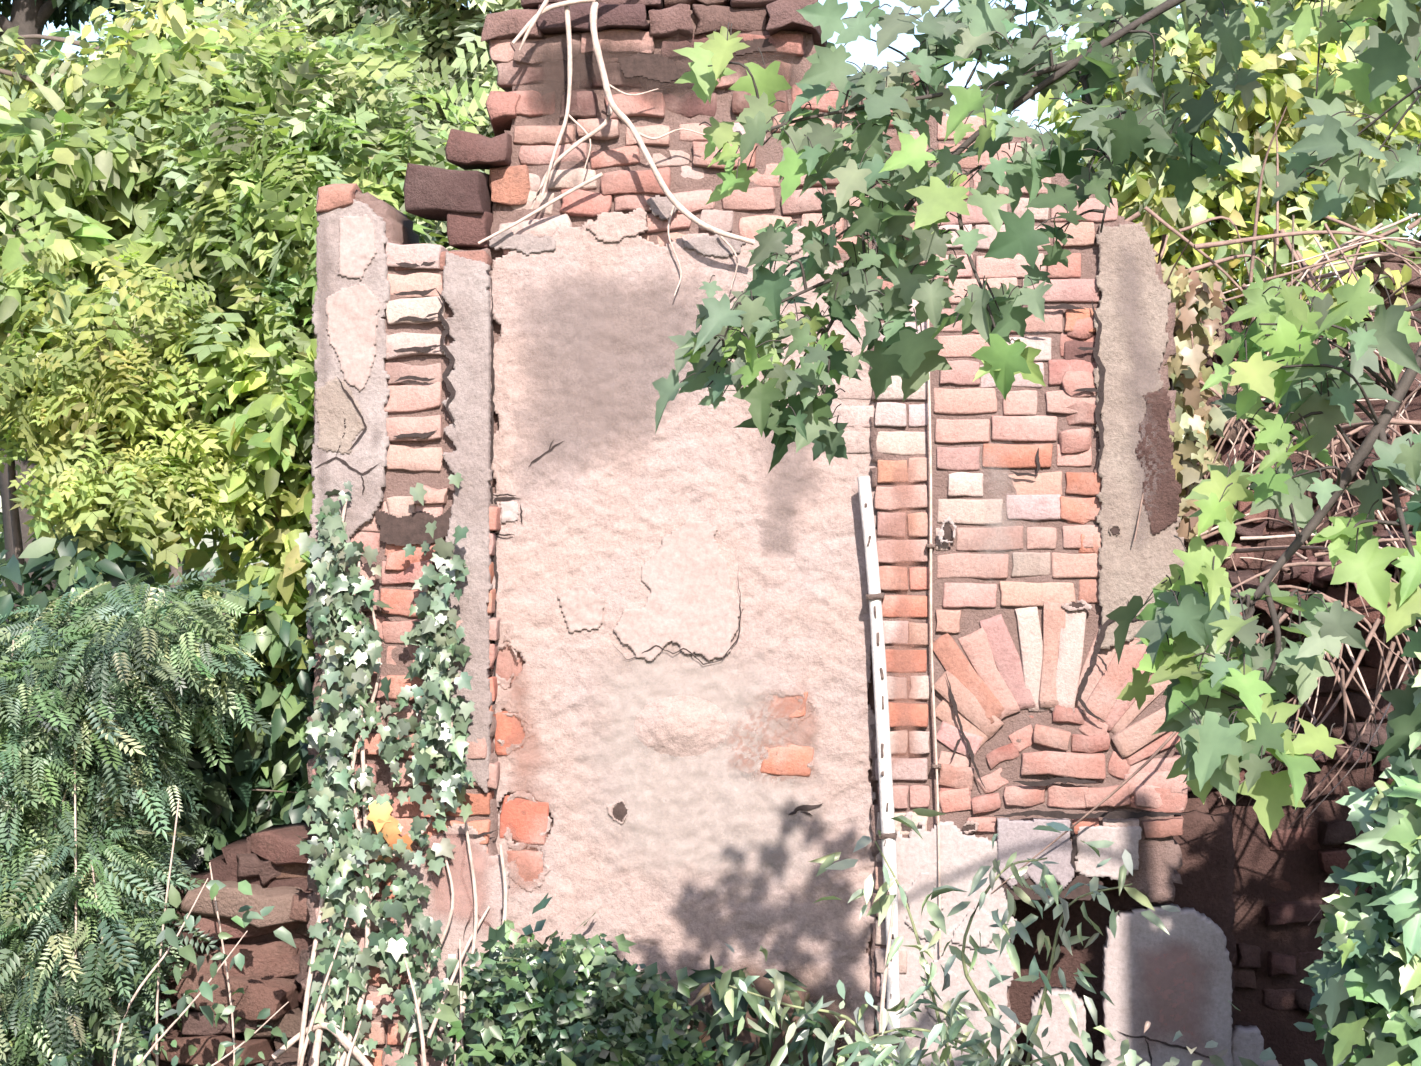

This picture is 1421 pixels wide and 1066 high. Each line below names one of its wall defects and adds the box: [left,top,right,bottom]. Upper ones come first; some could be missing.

flaking render [489,30,871,258]
flaking render [1135,387,1182,535]
flaking render [557,519,743,665]
spalling [490,630,524,690]
spalling [494,710,536,756]
spalling [758,685,815,783]
spalling [498,791,552,893]